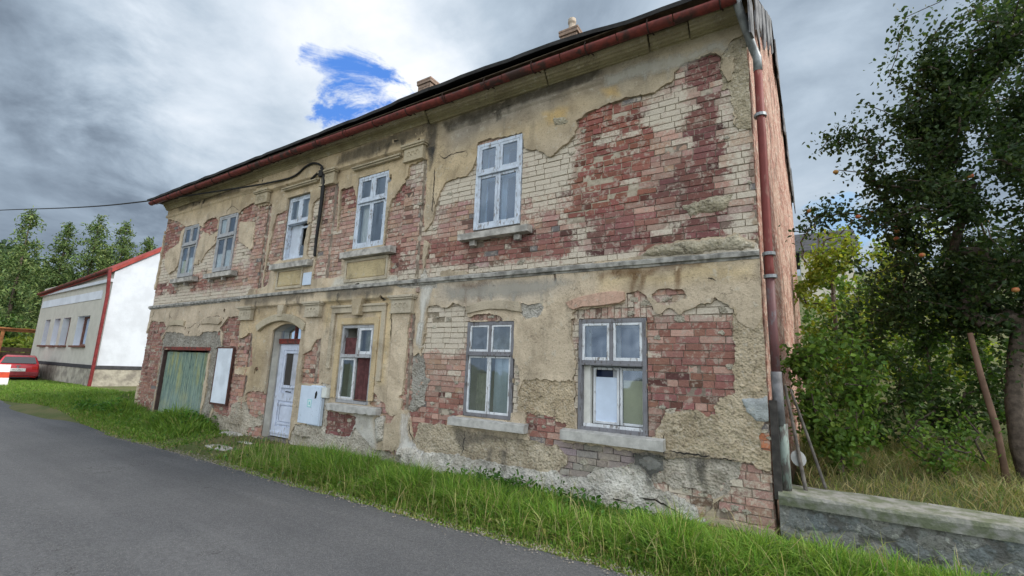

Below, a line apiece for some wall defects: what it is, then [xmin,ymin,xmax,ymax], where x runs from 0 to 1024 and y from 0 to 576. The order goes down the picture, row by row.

flaking render [385,36,759,292]
flaking render [153,203,289,306]
flaking render [308,184,357,279]
flaking render [137,316,268,438]
flaking render [289,339,400,464]
flaking render [371,289,775,531]